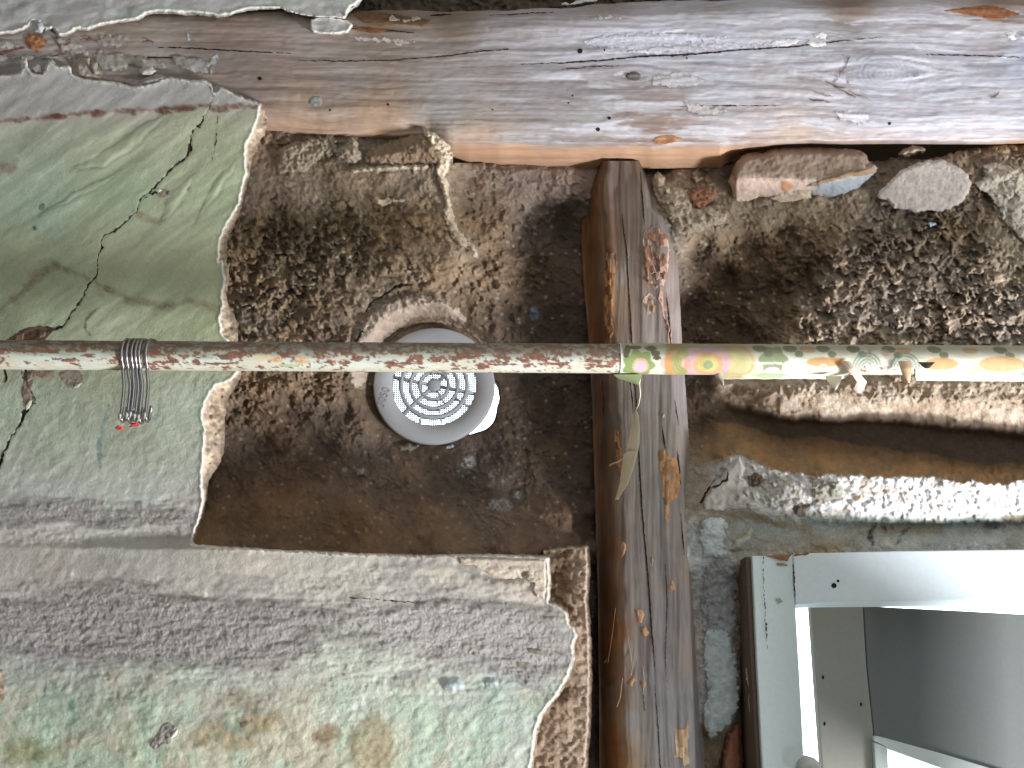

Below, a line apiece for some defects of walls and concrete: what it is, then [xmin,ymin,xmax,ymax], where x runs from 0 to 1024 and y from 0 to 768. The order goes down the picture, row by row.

peeling [20,58,167,86]
crack [46,96,218,331]
spalling [226,131,598,344]
crack [0,370,36,466]
spalling [0,370,599,768]